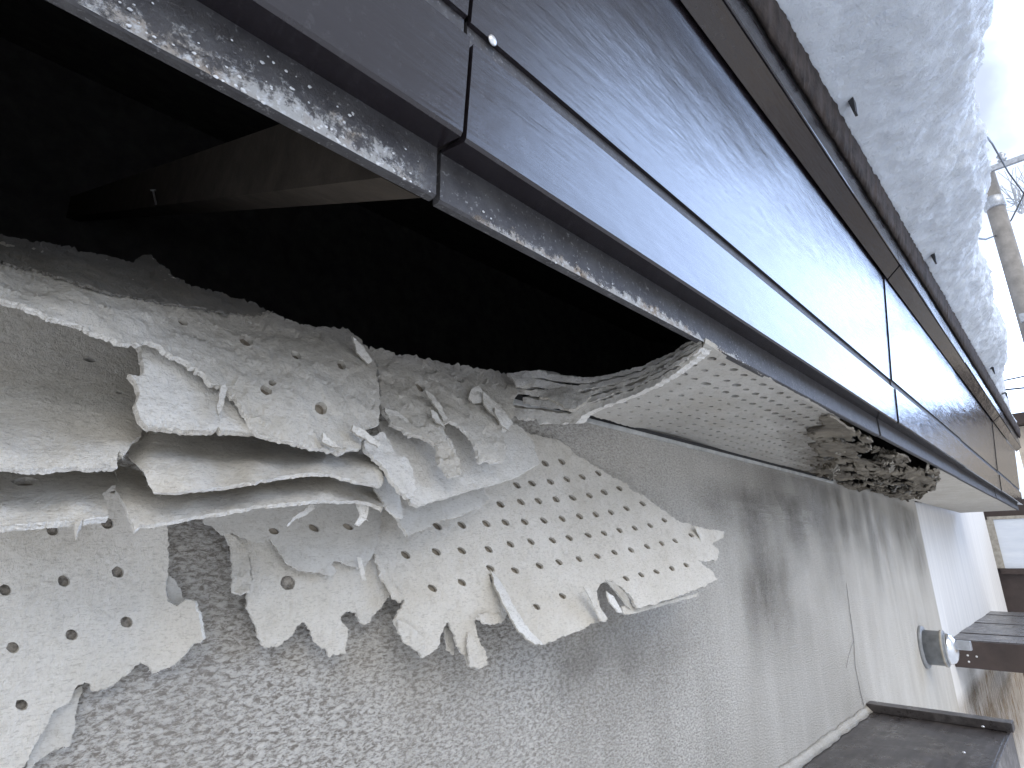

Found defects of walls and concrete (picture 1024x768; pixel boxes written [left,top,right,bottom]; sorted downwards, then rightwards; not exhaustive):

water stain [82,0,416,185]
water stain [480,210,705,342]
peeling [351,336,372,364]
peeling [468,386,513,431]
peeling [350,407,417,526]
peeling [823,434,940,502]
peeling [224,534,252,596]
peeling [0,492,206,768]
peeling [396,620,426,658]
peeling [443,627,488,669]
peeling [475,612,505,625]
peeling [582,580,698,622]